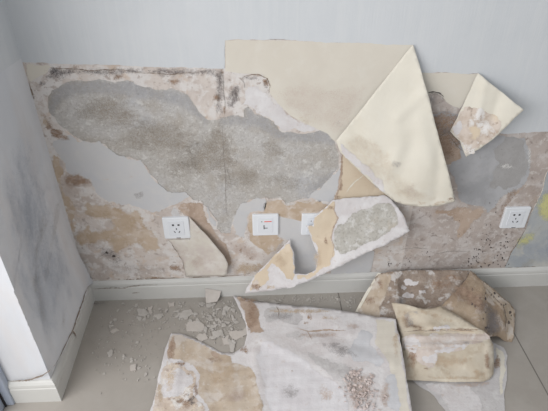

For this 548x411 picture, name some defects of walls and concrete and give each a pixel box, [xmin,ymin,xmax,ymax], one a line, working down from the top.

damp [40,65,140,85]
damp [148,66,270,117]
spalling [48,79,388,274]
peeling [433,110,531,239]